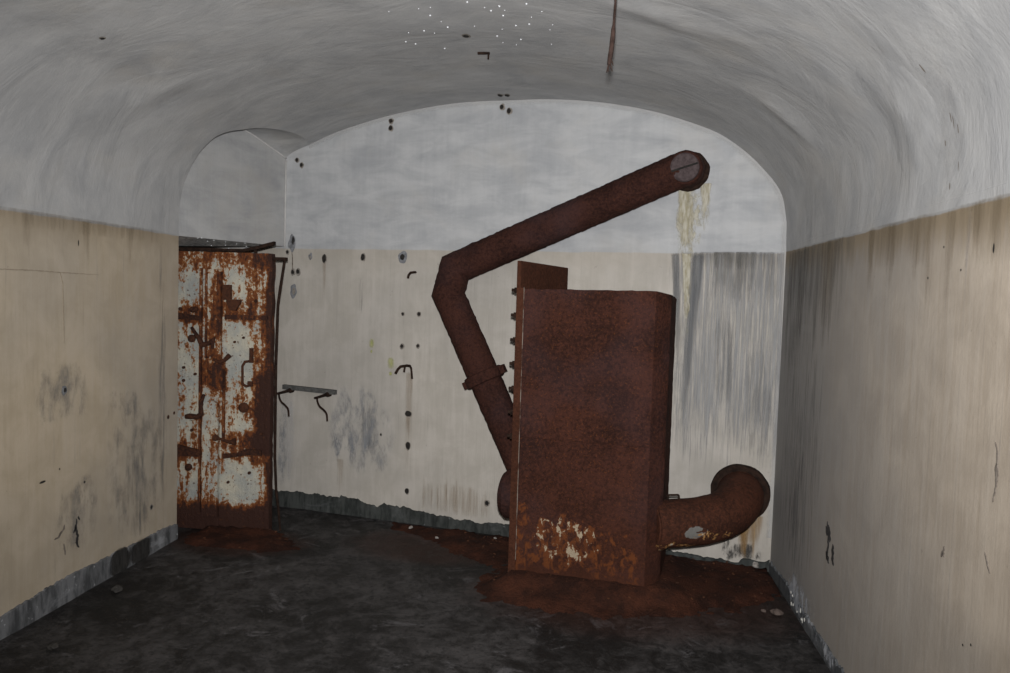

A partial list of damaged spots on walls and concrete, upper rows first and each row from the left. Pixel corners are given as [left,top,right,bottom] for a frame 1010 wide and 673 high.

leakage [673,183,784,447]
leakage [723,541,758,559]